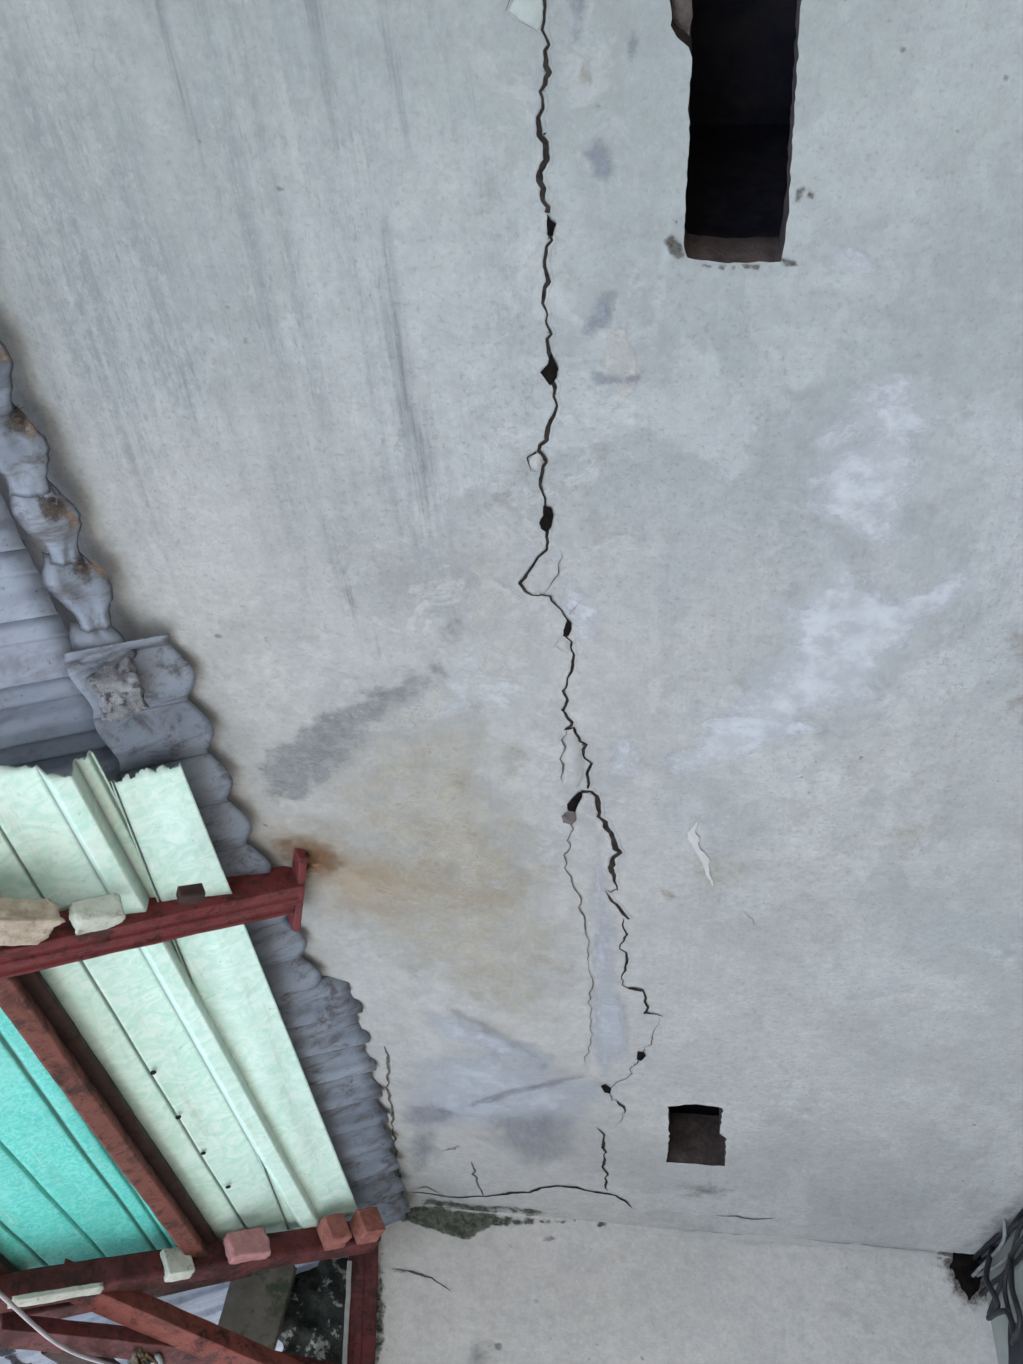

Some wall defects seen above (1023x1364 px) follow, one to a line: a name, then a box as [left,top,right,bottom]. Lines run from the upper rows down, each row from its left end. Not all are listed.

flaking render [506,0,542,32]
spalling [665,0,813,259]
crack [384,0,661,1208]
mould [401,1199,564,1239]